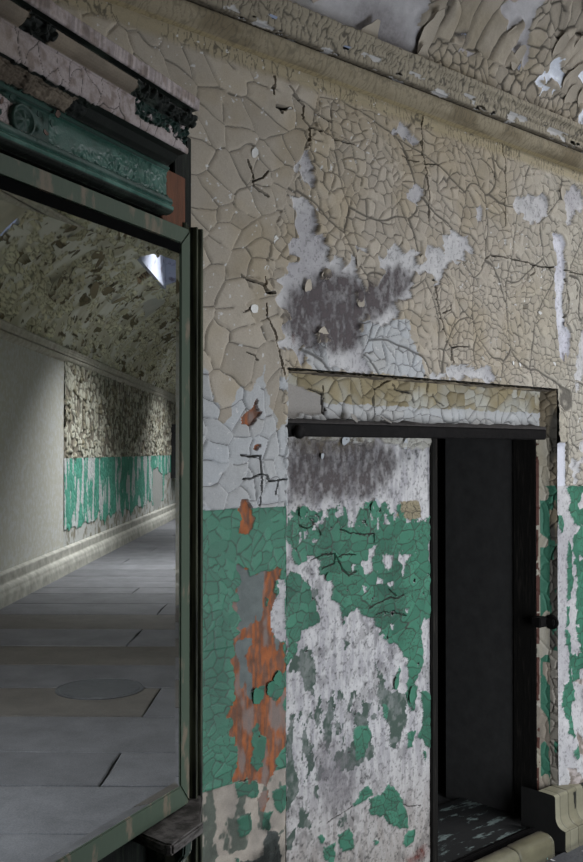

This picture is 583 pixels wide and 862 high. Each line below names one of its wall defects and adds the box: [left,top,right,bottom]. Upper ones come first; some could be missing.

peeling [289,0,445,59]
crack [271,75,355,146]
crack [241,273,286,375]
peeling [274,196,475,374]
crack [481,254,583,318]
peeling [552,232,583,392]
crack [308,385,325,415]
rust [238,499,256,534]
crack [240,454,288,506]
rust [227,563,286,811]
peeling [203,437,430,862]
peeling [557,431,583,785]